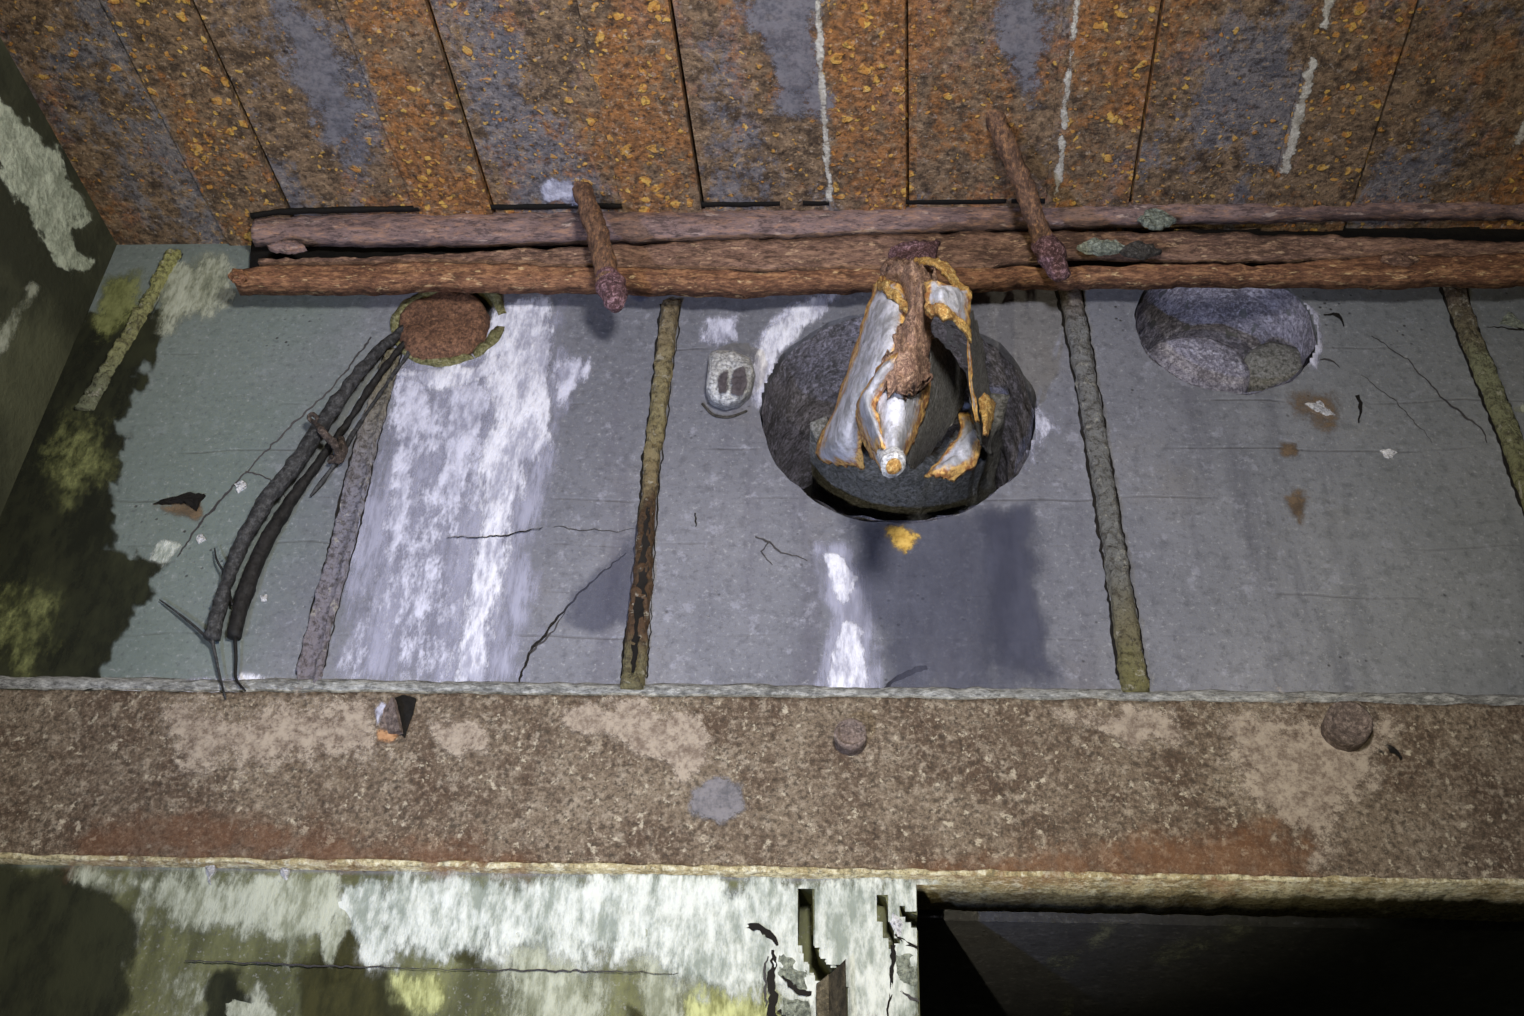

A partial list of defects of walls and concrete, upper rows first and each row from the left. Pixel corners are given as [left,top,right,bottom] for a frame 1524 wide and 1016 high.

peeling [0,99,95,272]
leakage [339,297,591,682]
crack [447,526,634,682]
rust [376,703,397,742]
leakage [0,863,939,1016]
spalling [778,954,811,1016]
spalling [889,913,917,987]